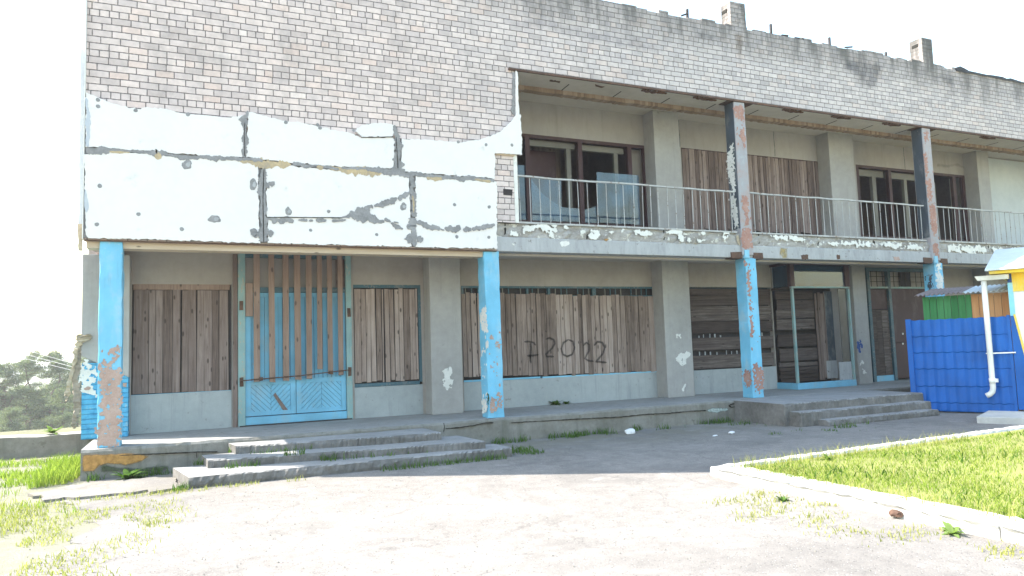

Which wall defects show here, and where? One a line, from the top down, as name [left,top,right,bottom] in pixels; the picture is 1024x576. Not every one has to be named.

peeling [823,131,1016,290]
peeling [510,224,653,247]
peeling [666,228,706,243]
peeling [722,105,765,394]
peeling [770,235,809,260]
peeling [480,305,503,413]
spalling [676,351,691,366]
spalling [442,367,453,390]
peeling [78,344,127,449]